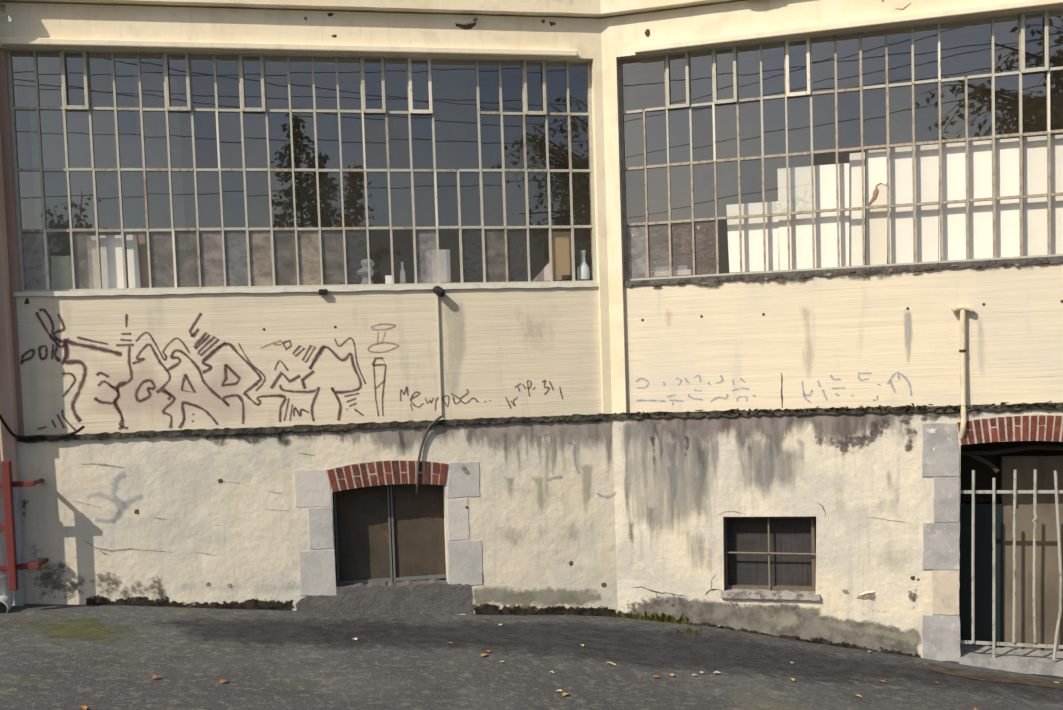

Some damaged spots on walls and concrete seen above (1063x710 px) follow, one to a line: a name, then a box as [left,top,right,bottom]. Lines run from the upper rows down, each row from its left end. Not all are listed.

spalling [455,17,477,30]
water stain [277,419,612,466]
water stain [625,412,917,523]
water stain [36,558,84,598]
water stain [97,572,166,599]